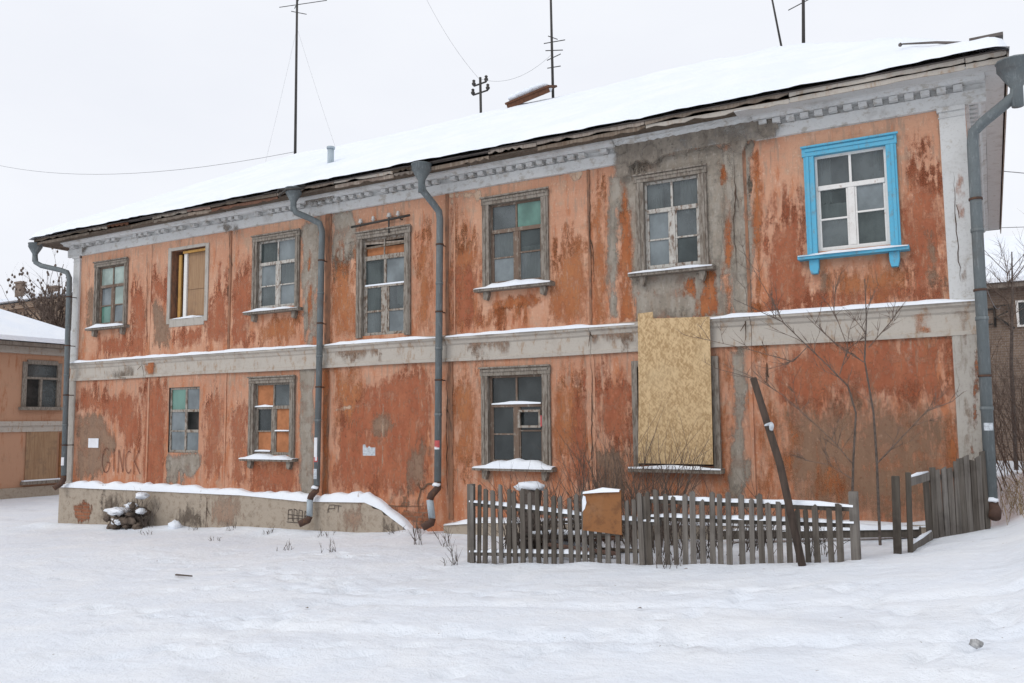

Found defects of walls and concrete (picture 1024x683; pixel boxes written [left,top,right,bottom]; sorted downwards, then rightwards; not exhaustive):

peeling [173,202,356,349]
peeling [449,209,493,332]
crack [732,153,740,265]
spalling [550,119,946,323]
flaking render [74,500,93,523]
spalling [75,369,316,493]
peeling [332,363,431,525]
peeling [719,336,955,509]